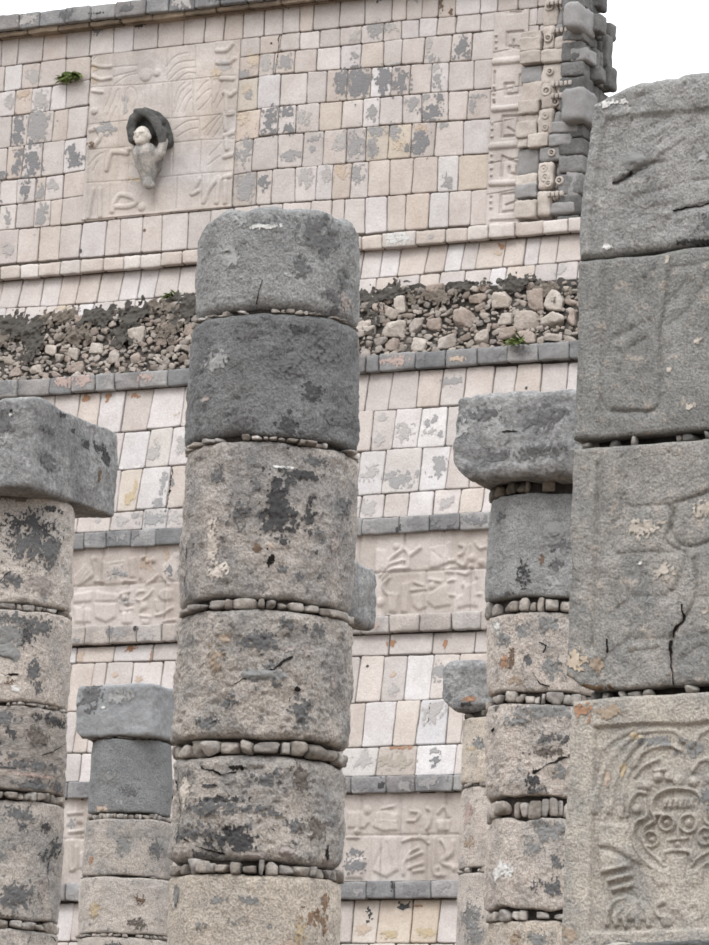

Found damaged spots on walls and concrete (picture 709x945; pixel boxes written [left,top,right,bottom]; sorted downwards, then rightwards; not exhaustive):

crack [669,604,686,686]